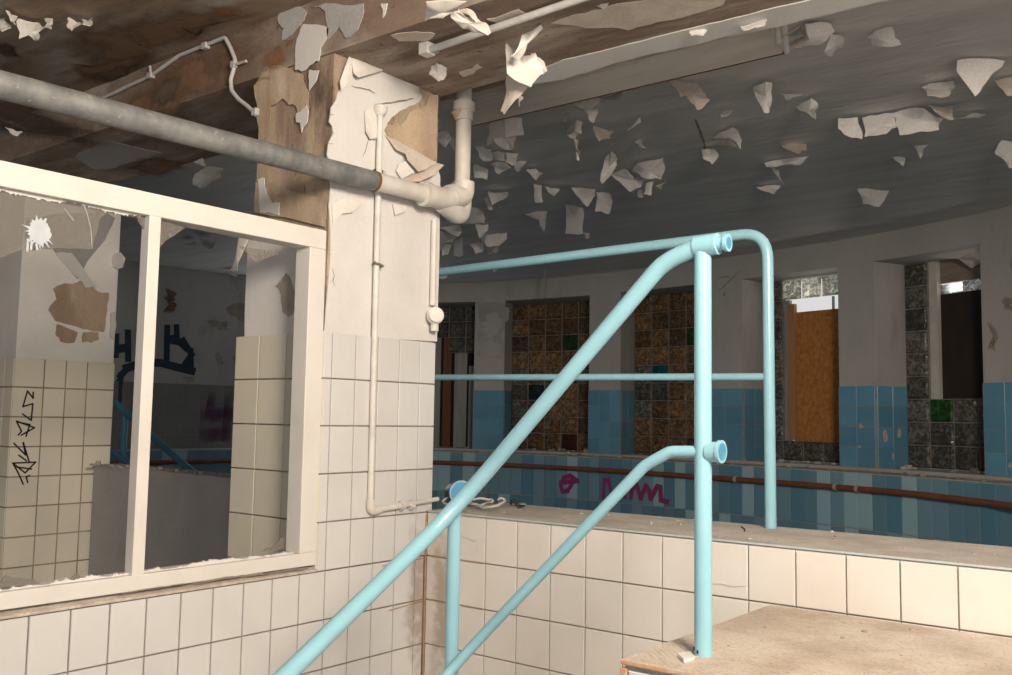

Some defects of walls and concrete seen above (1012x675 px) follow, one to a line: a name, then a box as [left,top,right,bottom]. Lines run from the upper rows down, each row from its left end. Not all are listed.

peeling [0,10,53,41]
peeling [67,17,93,32]
peeling [391,0,525,41]
peeling [254,3,364,141]
peeling [340,57,383,93]
spalling [363,95,455,182]
peeling [429,50,447,82]
peeling [473,0,889,239]
peeling [838,58,1012,139]
peeling [995,140,1012,168]
peeling [439,192,508,257]
spalling [48,213,116,343]